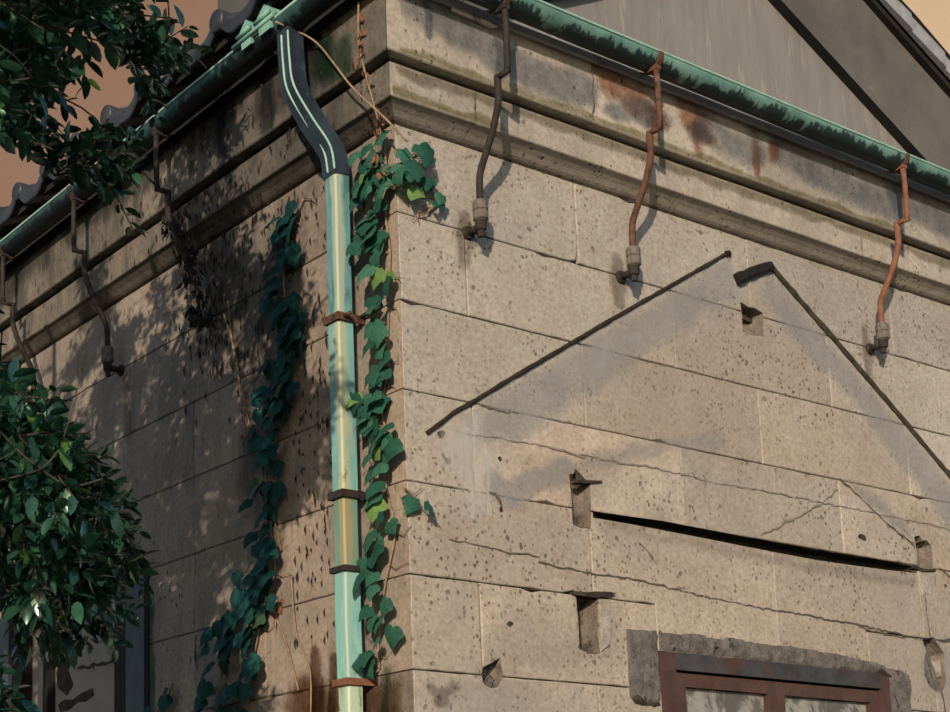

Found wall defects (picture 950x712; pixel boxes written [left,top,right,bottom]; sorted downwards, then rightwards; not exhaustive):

damp [443,263,738,519]
crack [456,431,950,546]
crack [450,536,931,640]